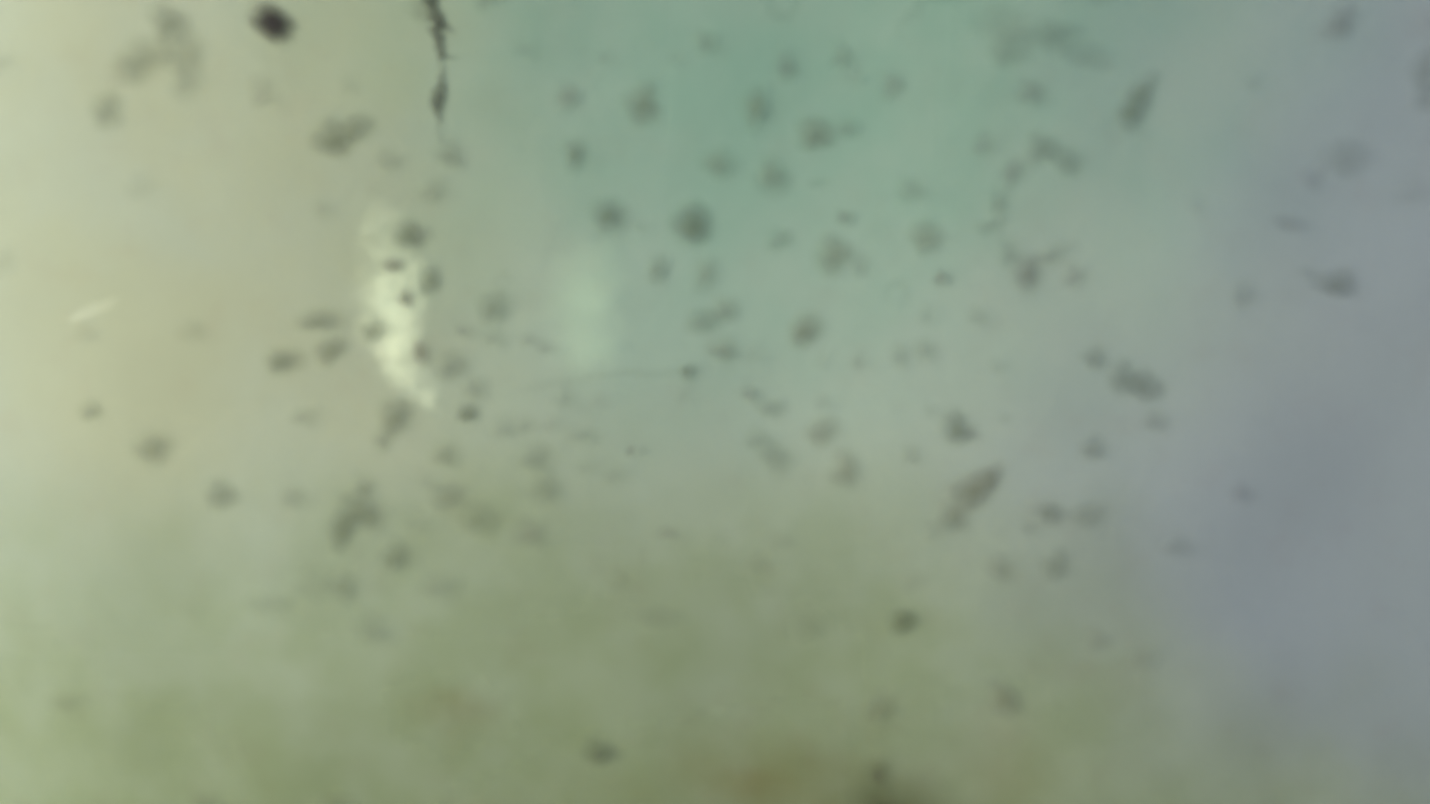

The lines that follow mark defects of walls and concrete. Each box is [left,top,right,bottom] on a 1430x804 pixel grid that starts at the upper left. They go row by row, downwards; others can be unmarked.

mould [258,9,284,36]
crack [427,0,442,48]
crack [432,93,442,109]